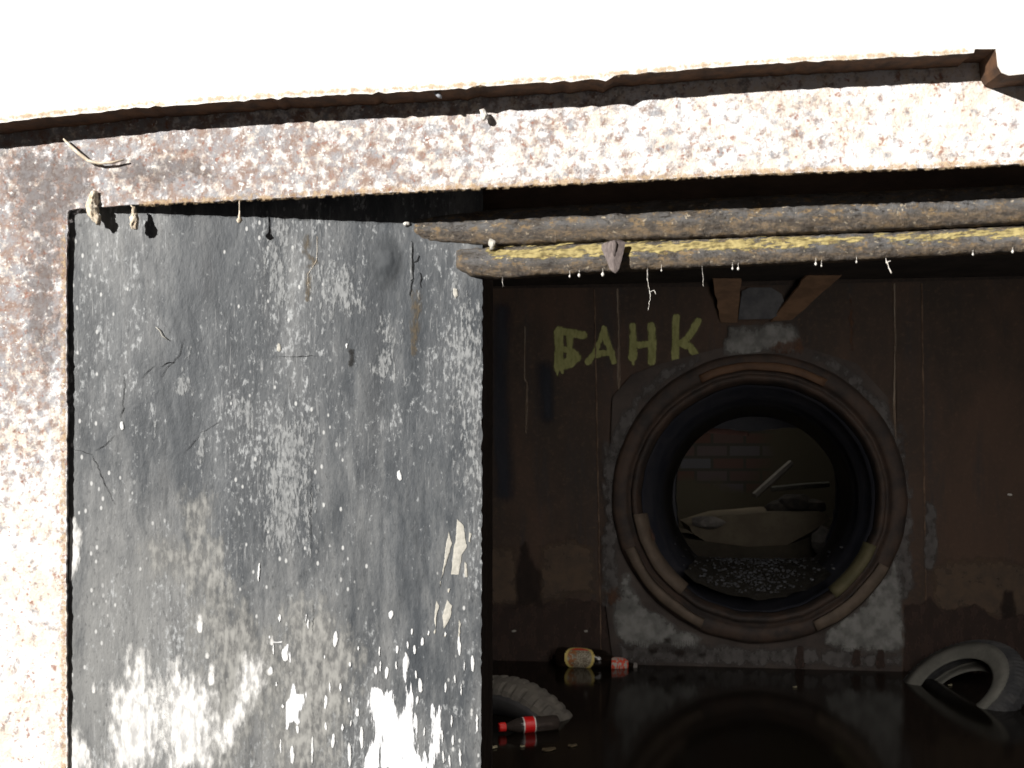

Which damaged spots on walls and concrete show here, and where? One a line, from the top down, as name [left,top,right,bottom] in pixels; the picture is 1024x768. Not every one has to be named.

corrosion [176,88,374,103]
corrosion [392,76,592,90]
corrosion [609,62,731,75]
corrosion [112,150,696,205]
corrosion [709,168,790,177]
corrosion [805,160,998,172]
corrosion [0,149,96,388]
crack [80,341,184,501]
peeling [324,519,474,768]
peeling [69,721,92,768]
peeling [108,636,291,768]
peeling [280,684,307,763]